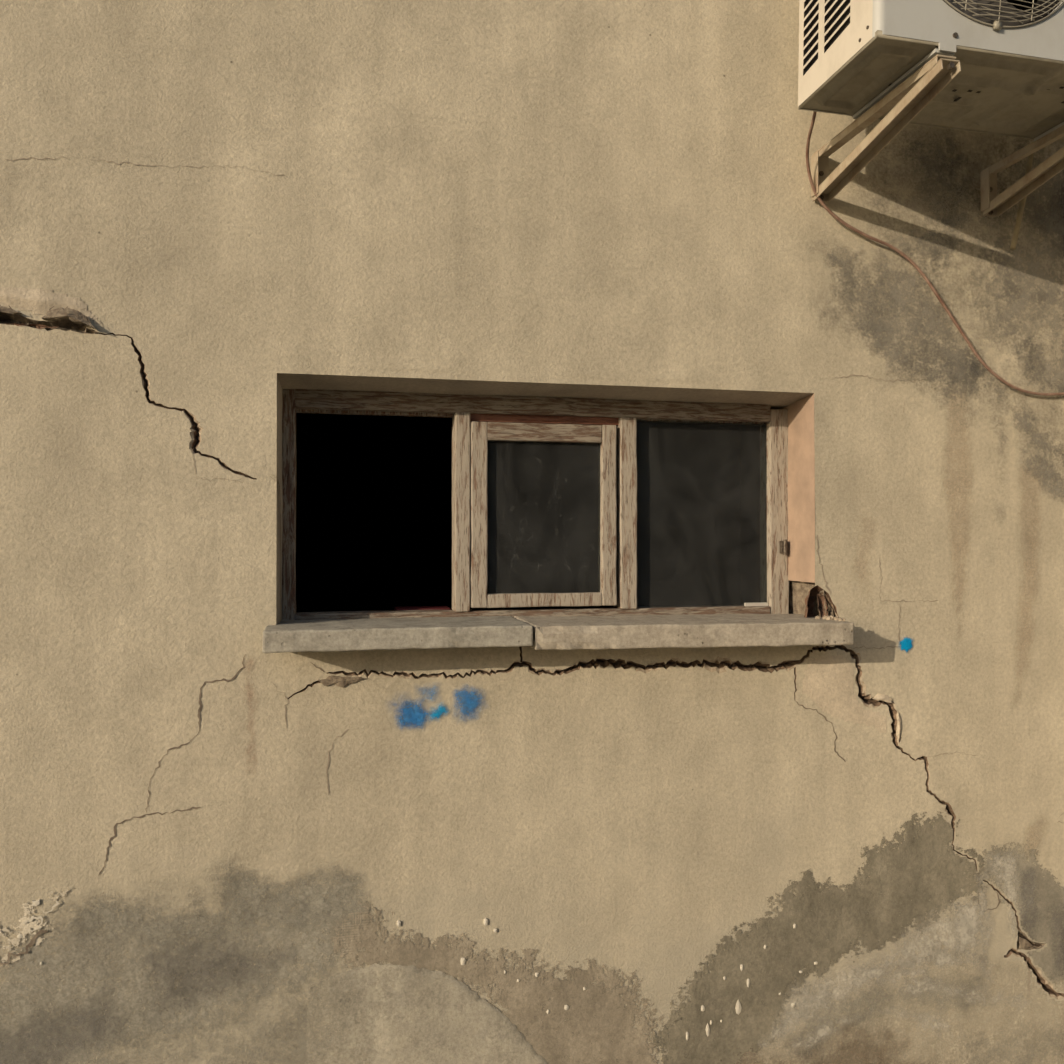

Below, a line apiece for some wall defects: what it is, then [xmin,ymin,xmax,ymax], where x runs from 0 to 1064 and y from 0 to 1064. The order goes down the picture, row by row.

leakage [829,253,980,392]
leakage [898,143,1064,392]
crack [92,331,281,609]
crack [99,654,246,875]
crack [276,558,1064,1045]
leakage [0,811,1064,1064]